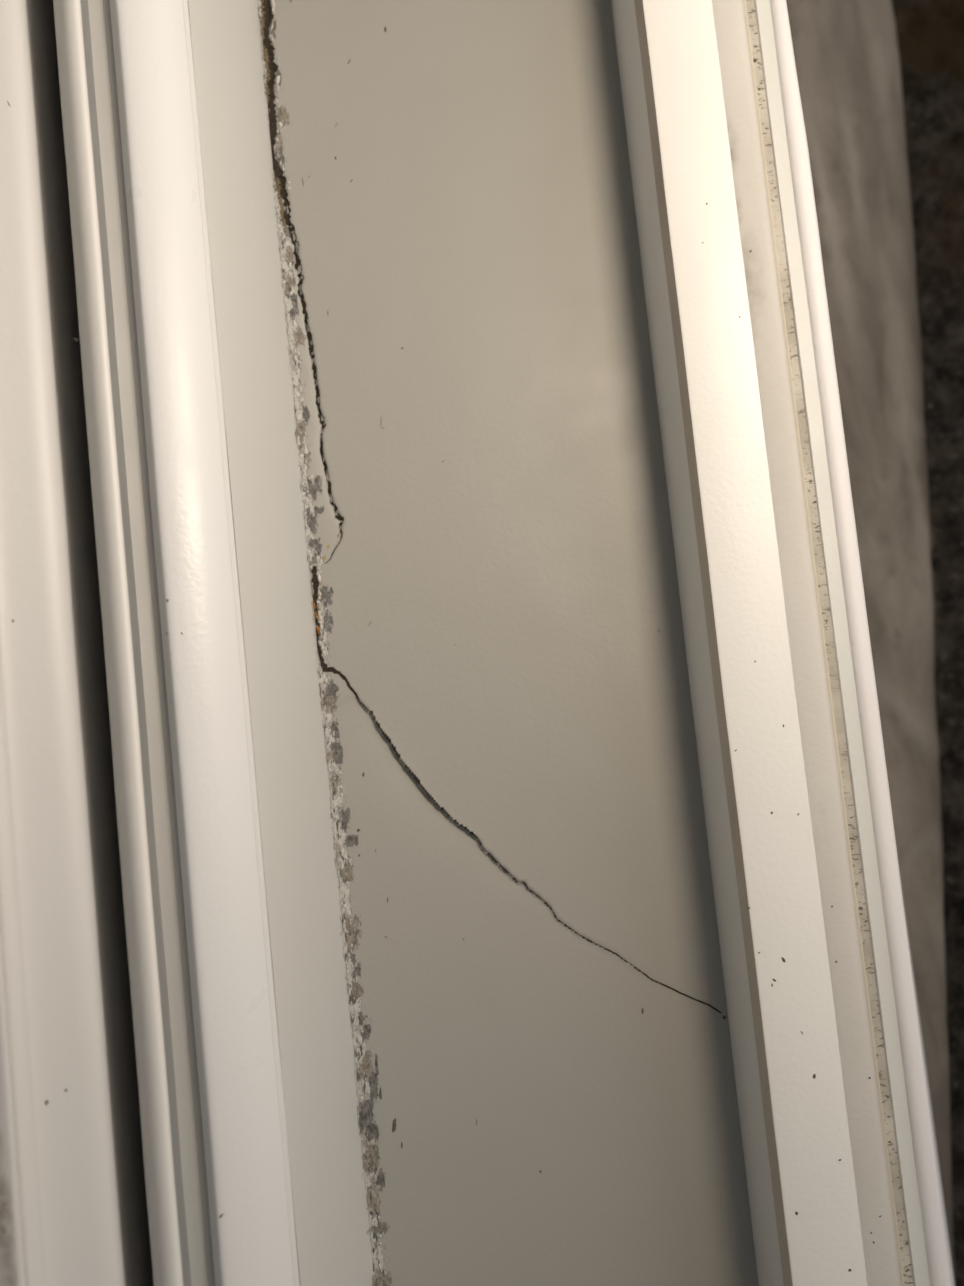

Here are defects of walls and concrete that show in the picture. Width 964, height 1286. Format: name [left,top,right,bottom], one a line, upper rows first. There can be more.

peeling [258,0,392,1286]
crack [259,0,722,1013]